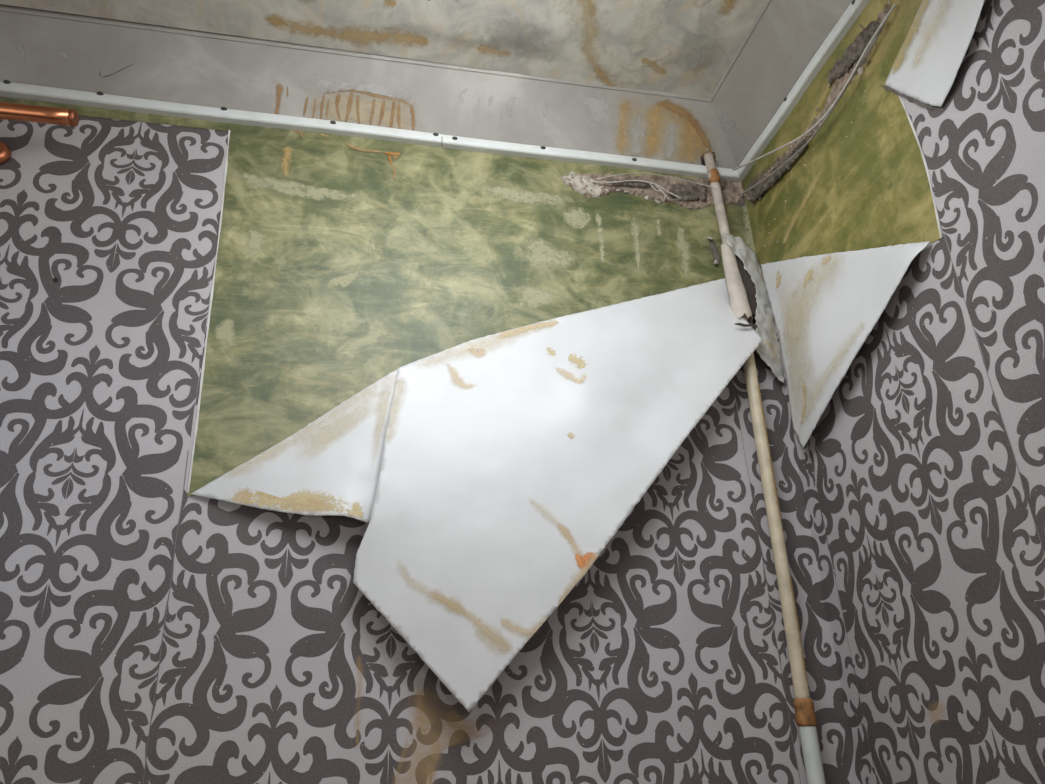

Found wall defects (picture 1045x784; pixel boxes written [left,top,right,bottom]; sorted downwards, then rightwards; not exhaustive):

water stain [266,15,427,45]
water stain [564,0,670,87]
peeling [309,78,400,97]
water stain [584,98,714,161]
flaking render [720,0,985,449]
peeling [0,97,763,712]